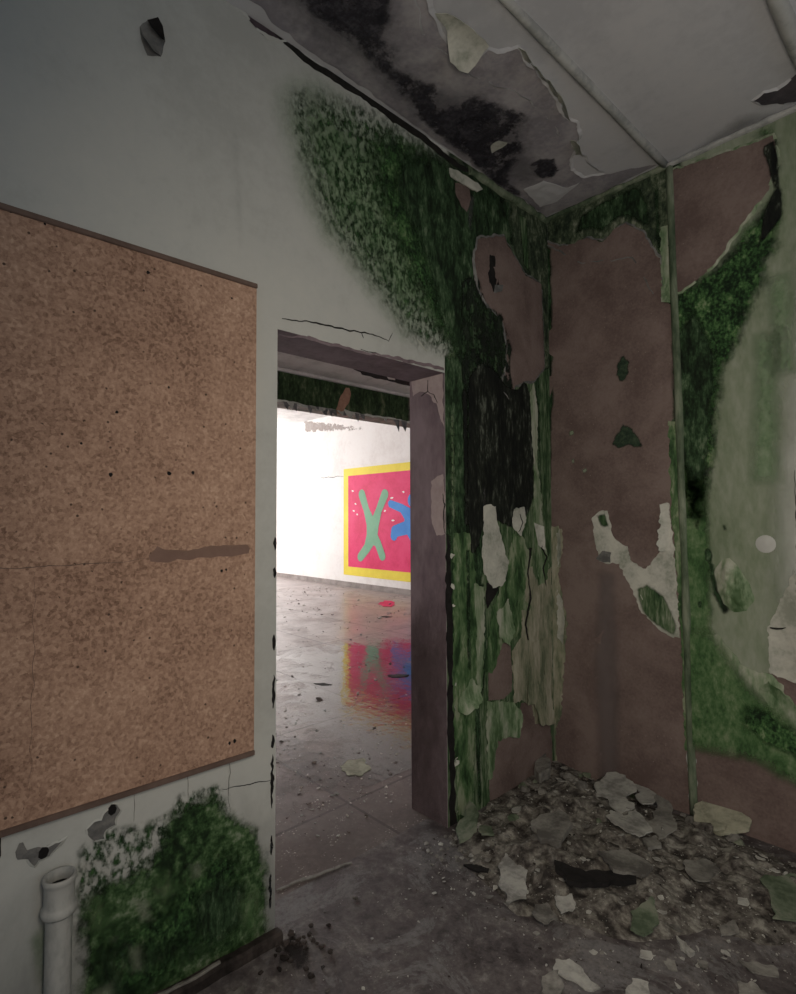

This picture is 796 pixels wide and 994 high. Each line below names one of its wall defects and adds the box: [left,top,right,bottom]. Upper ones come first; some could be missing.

peeling [140,17,165,57]
spalling [238,0,656,216]
spalling [751,75,796,106]
crack [282,318,393,353]
leakage [307,0,796,675]
spalling [431,133,796,922]
leakage [472,572,524,811]
spalling [85,802,122,842]
spalling [15,836,67,868]